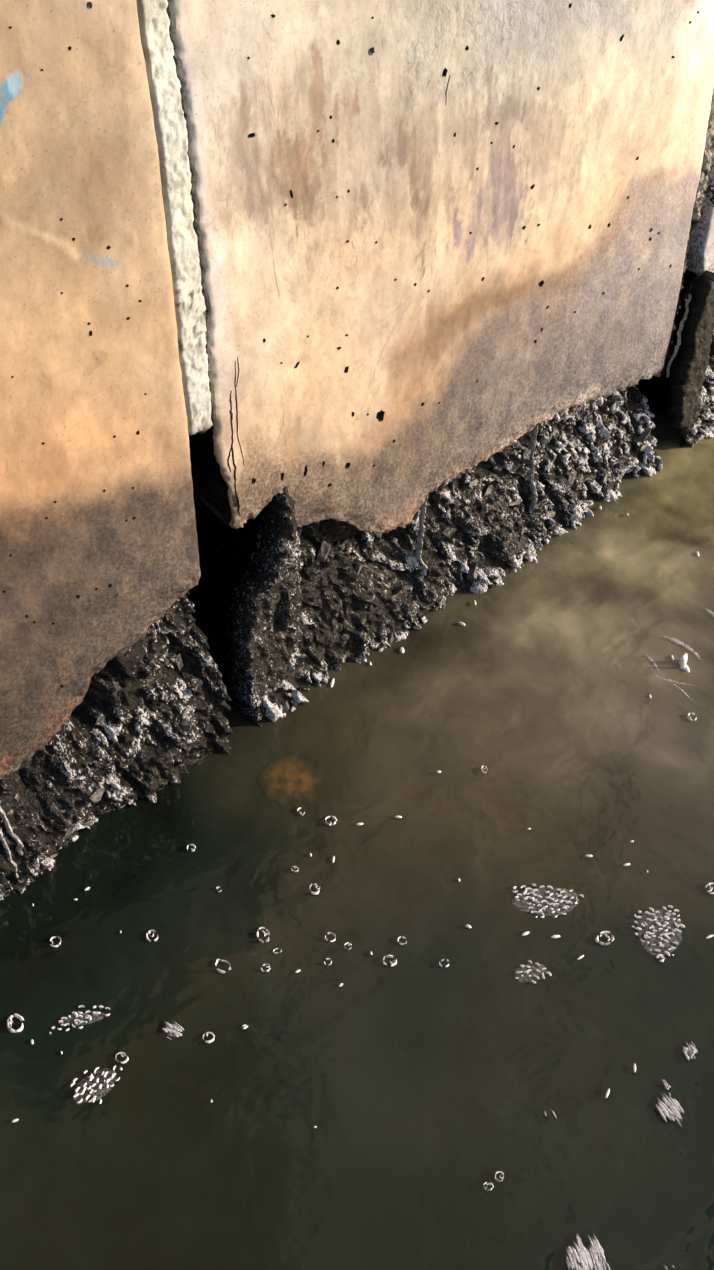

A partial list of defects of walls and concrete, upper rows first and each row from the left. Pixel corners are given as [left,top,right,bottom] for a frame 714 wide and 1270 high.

damp [0,419,201,749]
crack [227,357,244,515]
spalling [0,270,700,900]
damp [191,24,703,531]
spalling [678,330,714,448]